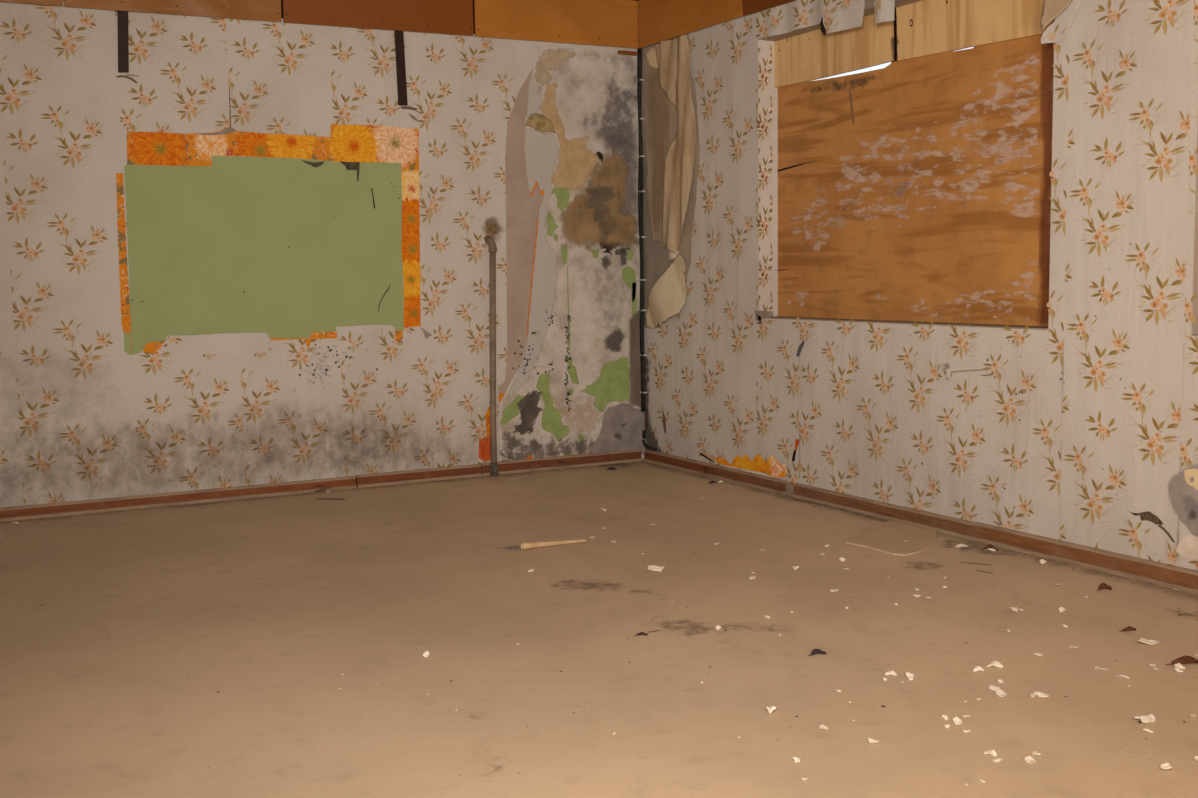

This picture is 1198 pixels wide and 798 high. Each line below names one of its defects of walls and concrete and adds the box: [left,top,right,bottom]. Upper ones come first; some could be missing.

flaking render [498,39,700,461]
damp [294,344,367,391]
flaking render [1167,464,1198,566]